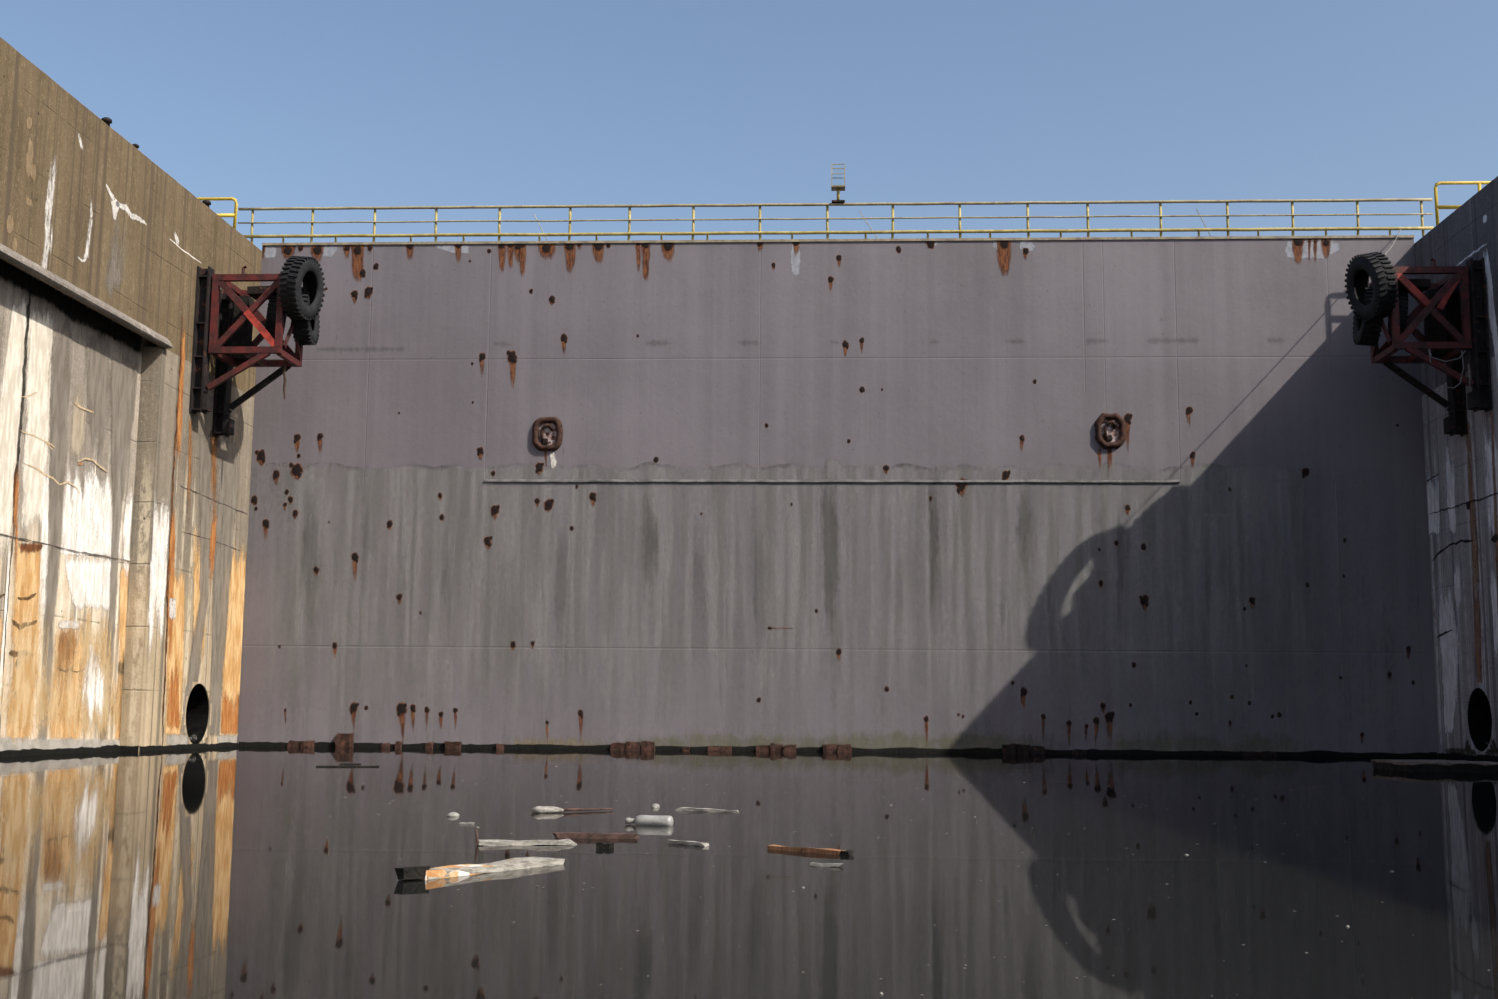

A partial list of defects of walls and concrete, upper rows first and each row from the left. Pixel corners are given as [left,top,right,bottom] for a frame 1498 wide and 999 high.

rust [487,244,610,305]
rust [636,243,674,279]
rust [997,241,1029,274]
damp [0,115,142,751]
damp [177,333,185,453]
rust [1098,413,1133,467]
rust [0,543,130,740]
damp [148,506,175,656]
damp [167,436,238,745]
rust [165,431,247,735]
damp [289,451,1252,683]
rust [1466,412,1498,683]